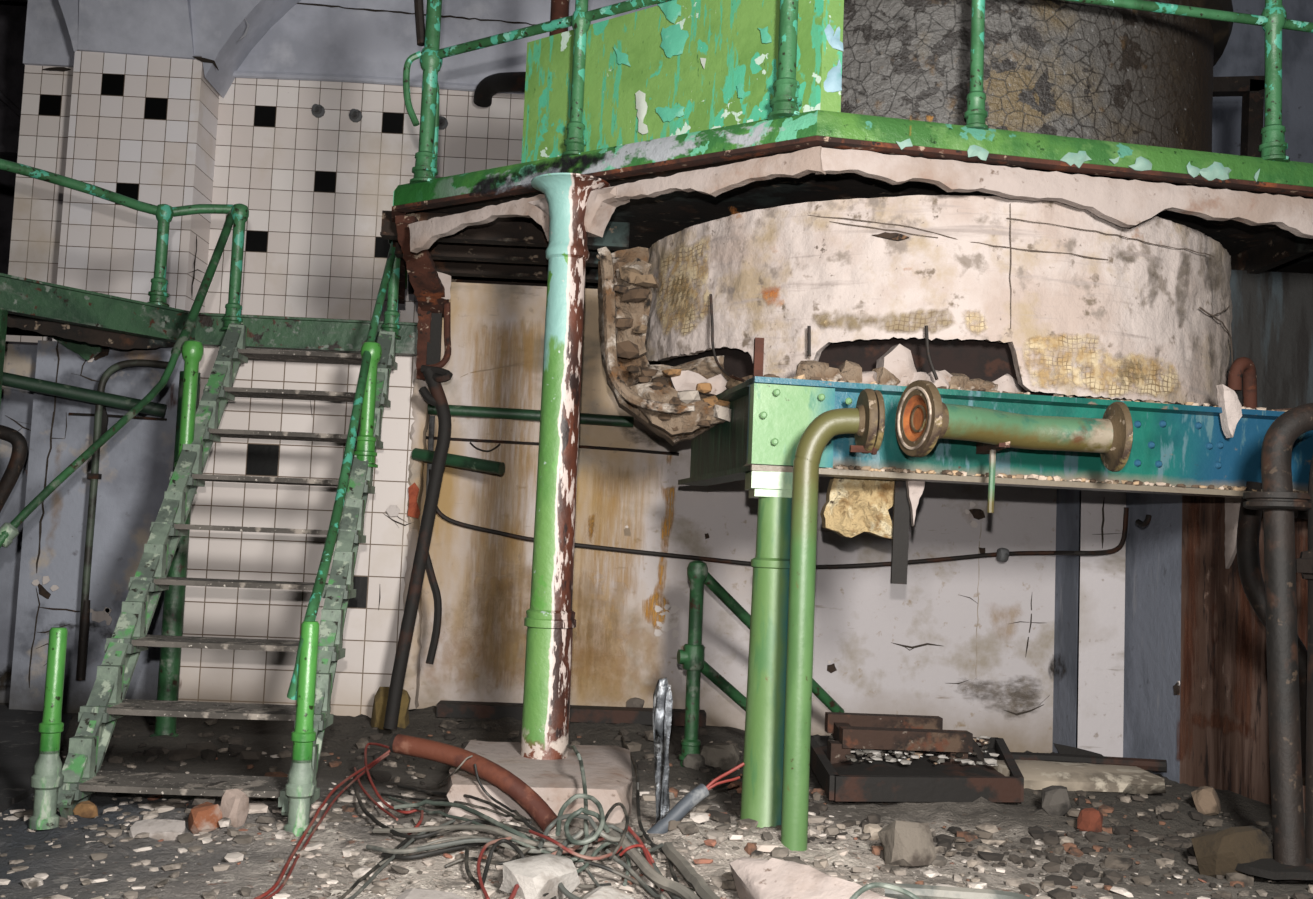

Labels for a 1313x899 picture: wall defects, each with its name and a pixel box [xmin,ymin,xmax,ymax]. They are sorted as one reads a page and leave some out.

peeling [613,47,631,67]
peeling [657,0,689,58]
peeling [758,26,772,44]
peeling [824,19,843,92]
peeling [635,90,685,135]
spalling [602,139,1313,239]
spalling [408,194,550,253]
crack [5,342,99,688]
crack [893,643,942,651]
crack [949,532,981,684]
crack [1010,596,1040,657]
water stain [969,679,1035,716]